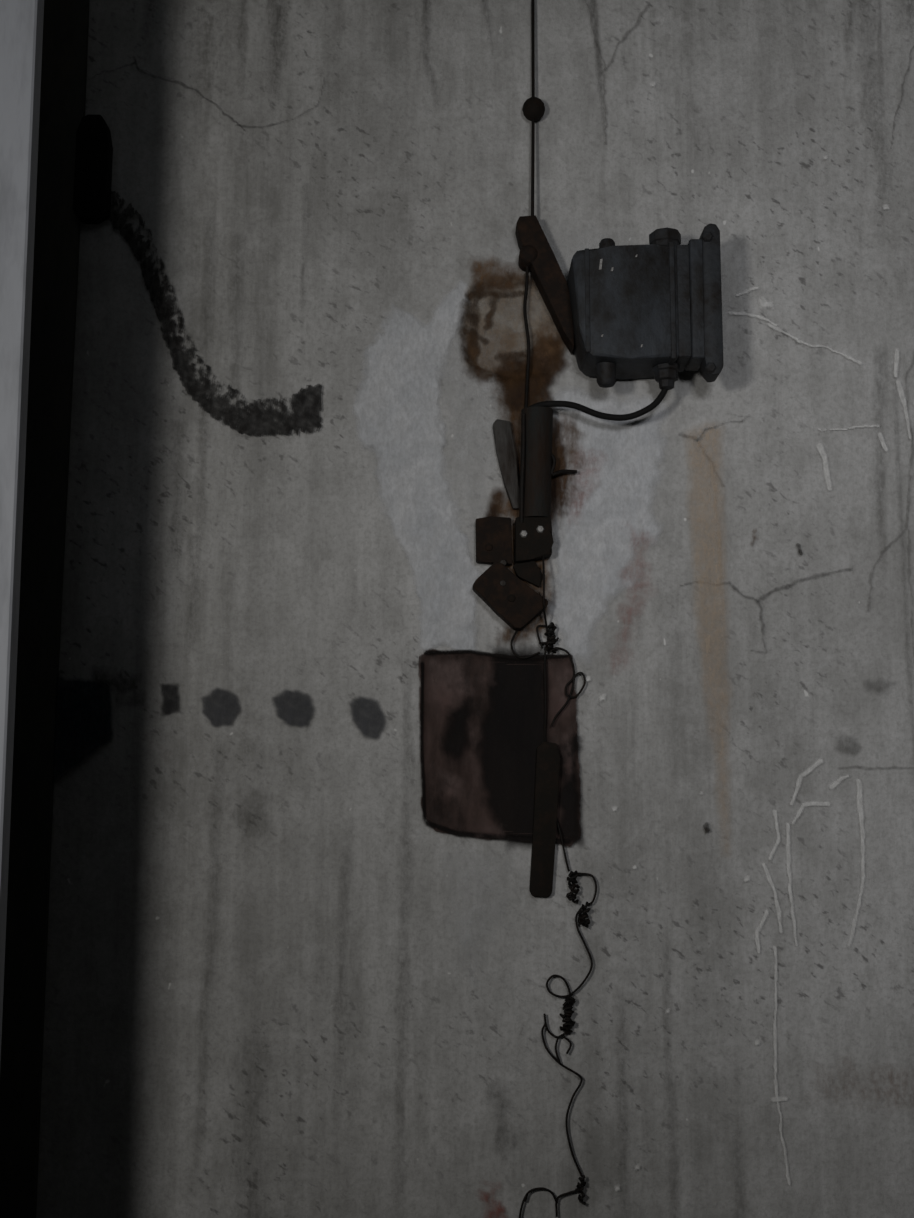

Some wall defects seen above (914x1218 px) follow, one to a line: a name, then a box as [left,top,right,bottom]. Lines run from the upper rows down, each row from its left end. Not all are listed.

corrosion [475,326,578,515]
crack [798,340,862,364]
corrosion [419,490,581,847]